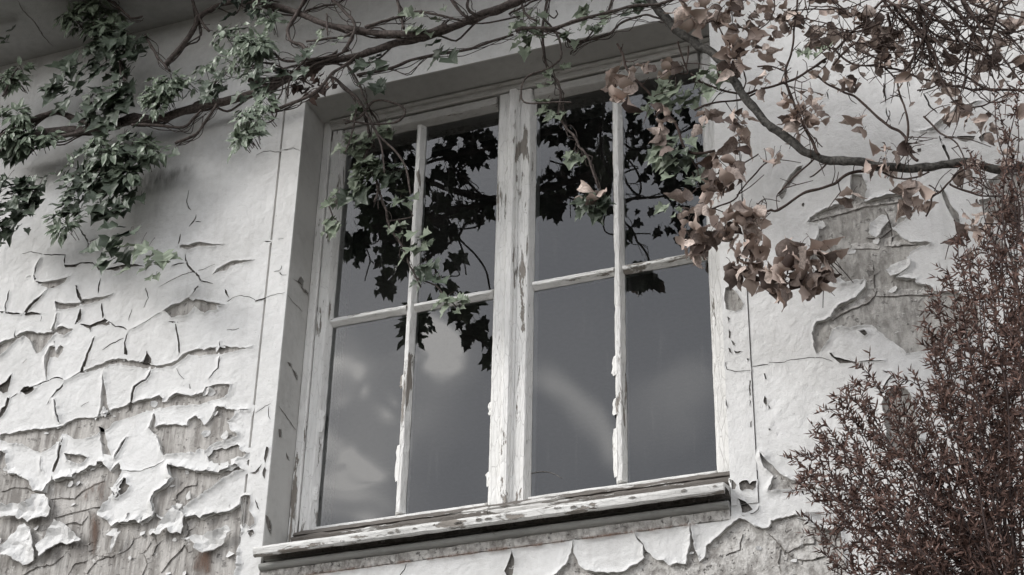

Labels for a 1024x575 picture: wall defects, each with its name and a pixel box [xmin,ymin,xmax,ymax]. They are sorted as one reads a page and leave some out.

peeling [0,311,76,381]
crack [0,189,302,479]
peeling [126,283,229,335]
spalling [722,285,750,362]
peeling [800,171,989,358]
peeling [0,367,272,575]
peeling [545,446,852,575]